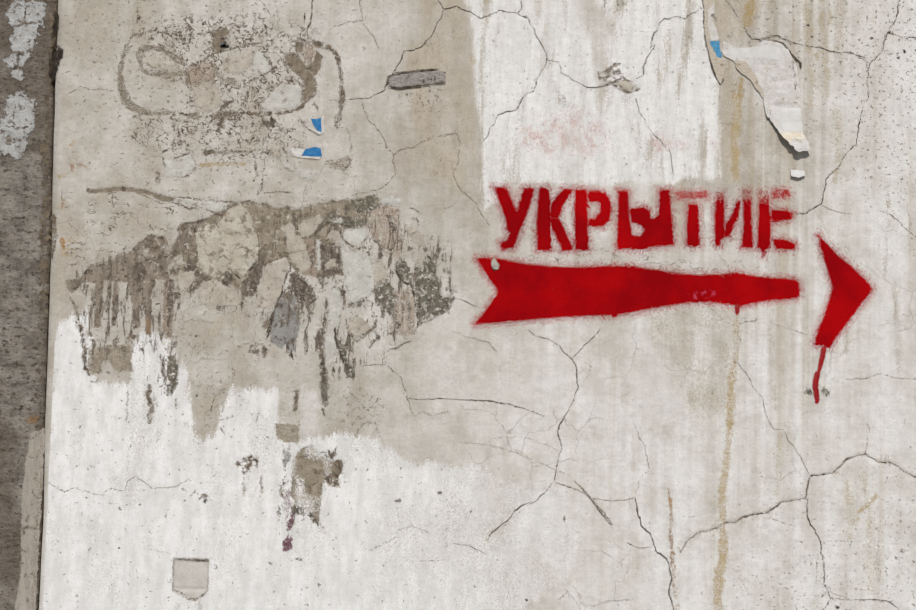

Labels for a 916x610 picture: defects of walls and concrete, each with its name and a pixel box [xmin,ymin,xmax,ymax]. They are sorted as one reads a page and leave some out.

damp [512,81,613,160]
crack [330,0,916,244]
peeling [65,0,459,415]
crack [365,361,448,416]
crack [48,476,190,495]
spalling [235,454,264,495]
peeling [275,389,347,561]
crack [428,308,916,610]
crack [151,549,209,601]